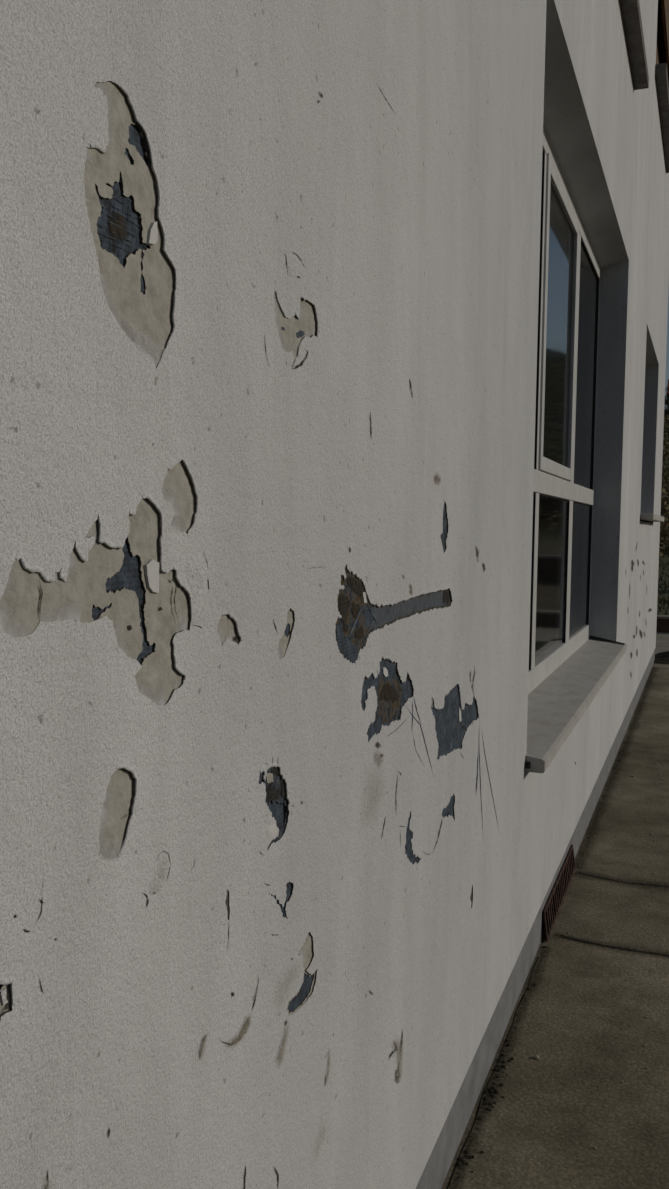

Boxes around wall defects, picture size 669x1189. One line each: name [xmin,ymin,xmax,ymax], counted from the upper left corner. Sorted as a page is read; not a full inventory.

peeling [84,80,177,369]
peeling [274,292,319,369]
peeling [0,456,199,705]
spalling [217,610,242,646]
peeling [335,548,453,663]
peeling [361,655,414,762]
peeling [431,671,479,759]
peeling [99,763,138,860]
peeling [259,762,302,855]
peeling [400,794,455,864]
peeling [0,976,15,1020]
peeling [279,932,317,1062]